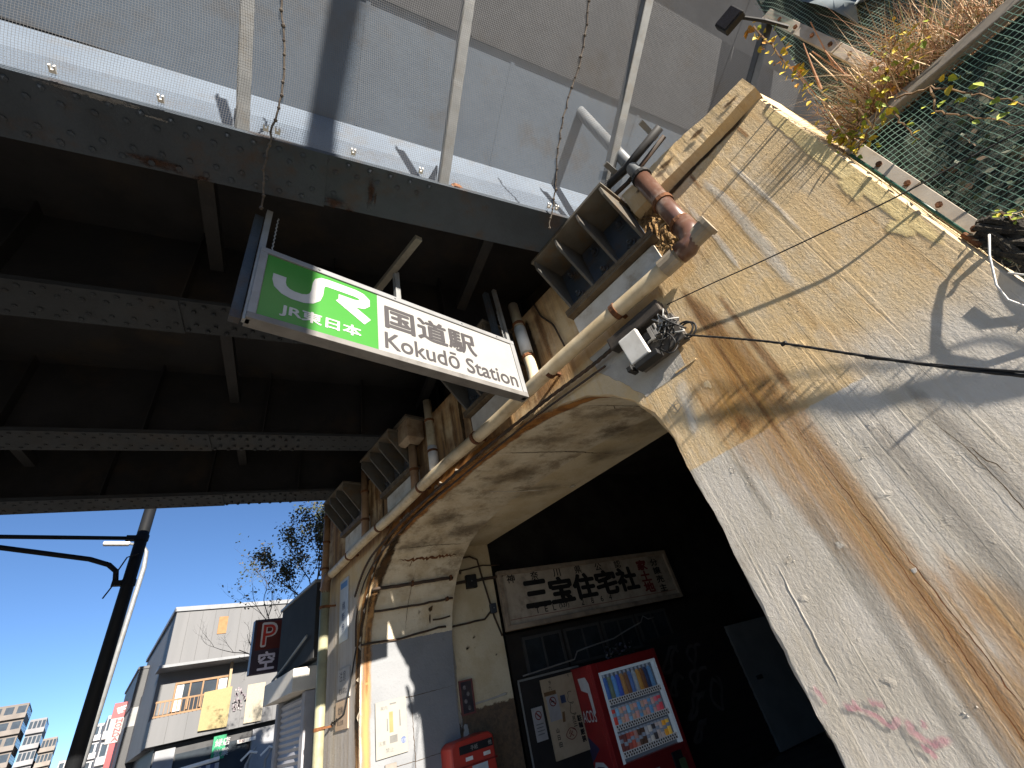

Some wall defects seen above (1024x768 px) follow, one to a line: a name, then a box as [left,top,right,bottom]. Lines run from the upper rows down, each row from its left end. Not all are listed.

corrosion [355,397,609,768]
corrosion [686,296,1024,744]
crack [784,412,1024,741]